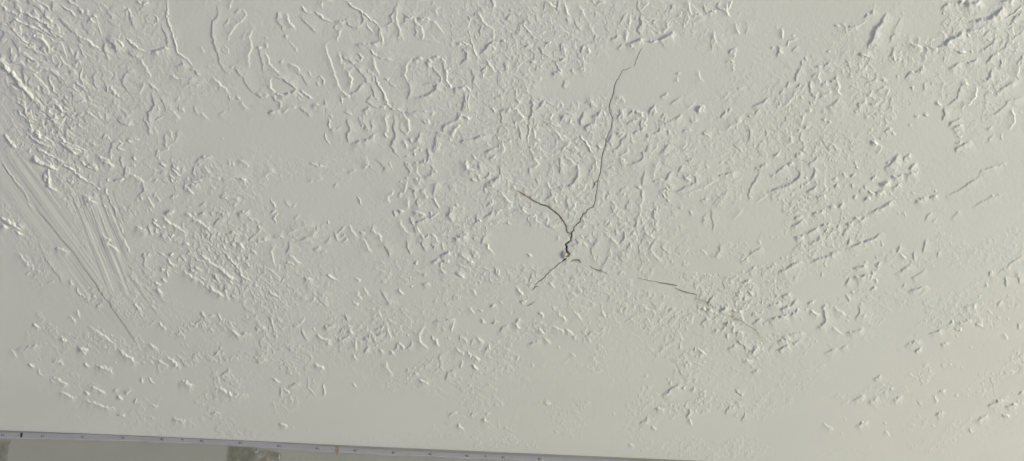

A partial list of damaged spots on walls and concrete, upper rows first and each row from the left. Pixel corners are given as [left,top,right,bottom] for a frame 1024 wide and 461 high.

crack [516,49,642,290]
crack [638,278,758,333]